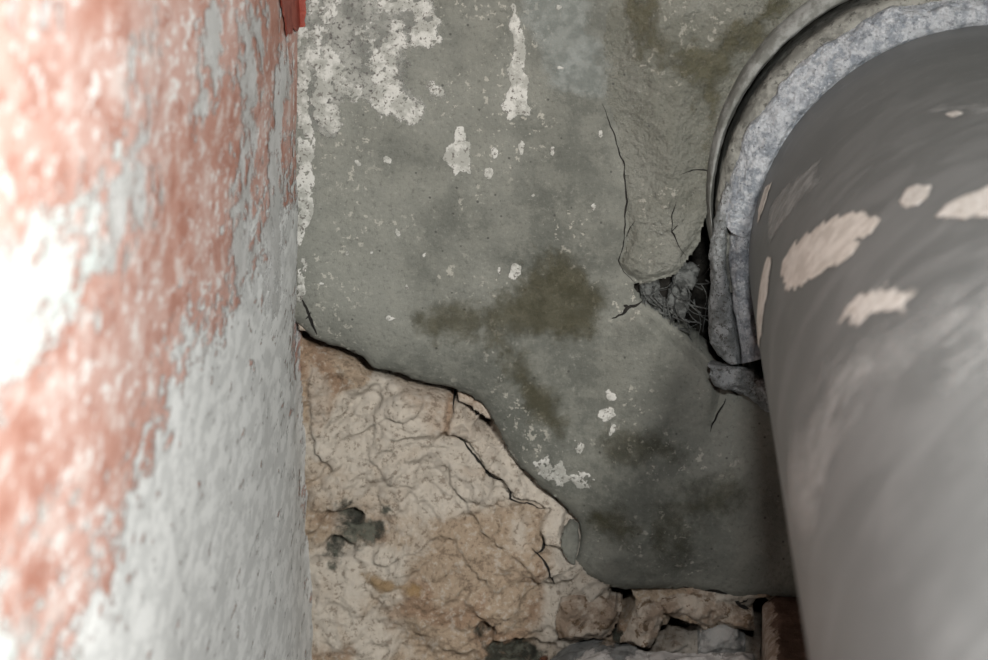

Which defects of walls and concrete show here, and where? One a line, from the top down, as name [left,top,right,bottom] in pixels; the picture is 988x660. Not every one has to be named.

leakage [626,0,789,114]
spalling [0,0,775,660]
leakage [417,254,602,341]
crack [602,104,643,319]